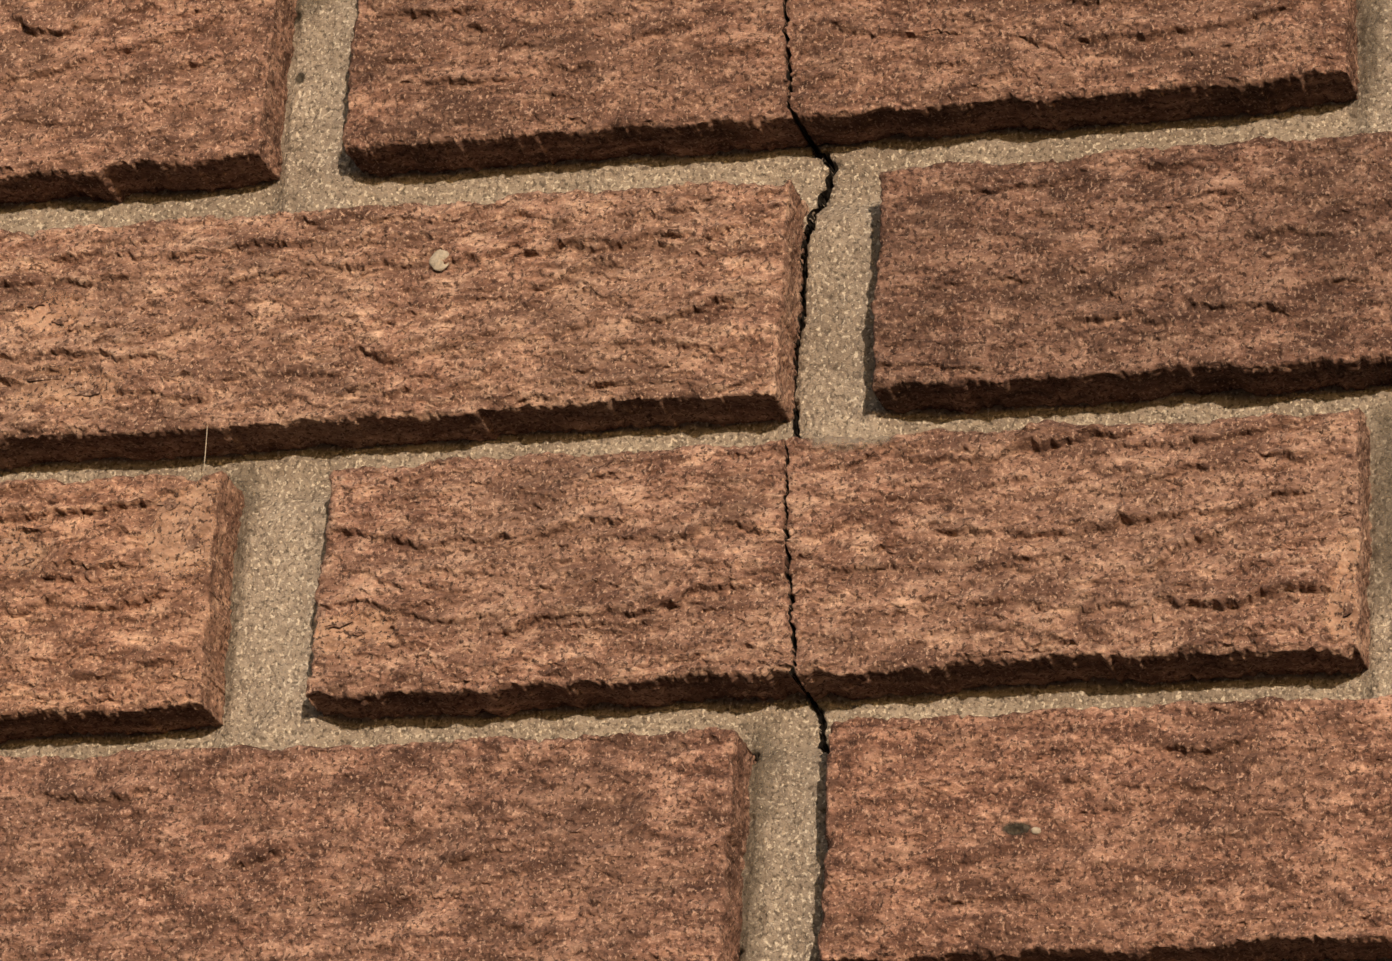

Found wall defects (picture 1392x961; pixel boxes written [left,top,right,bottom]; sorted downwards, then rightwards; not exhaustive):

crack [782,0,839,754]